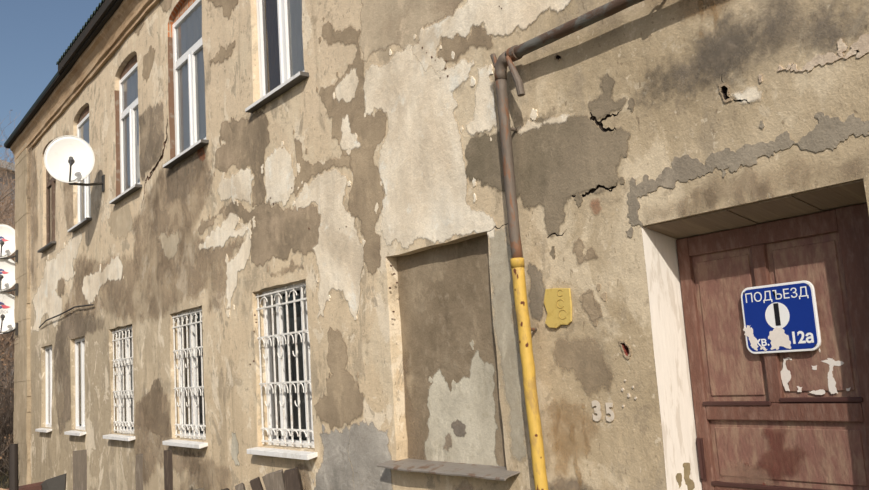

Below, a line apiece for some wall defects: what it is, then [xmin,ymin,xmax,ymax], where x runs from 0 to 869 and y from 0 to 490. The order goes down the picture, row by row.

crack [590,111,620,132]
crack [141,119,168,208]
crack [572,182,618,197]
peeling [108,204,132,238]
peeling [159,231,179,260]
peeling [198,0,869,466]
peeling [744,430,800,485]
peeling [676,463,695,490]